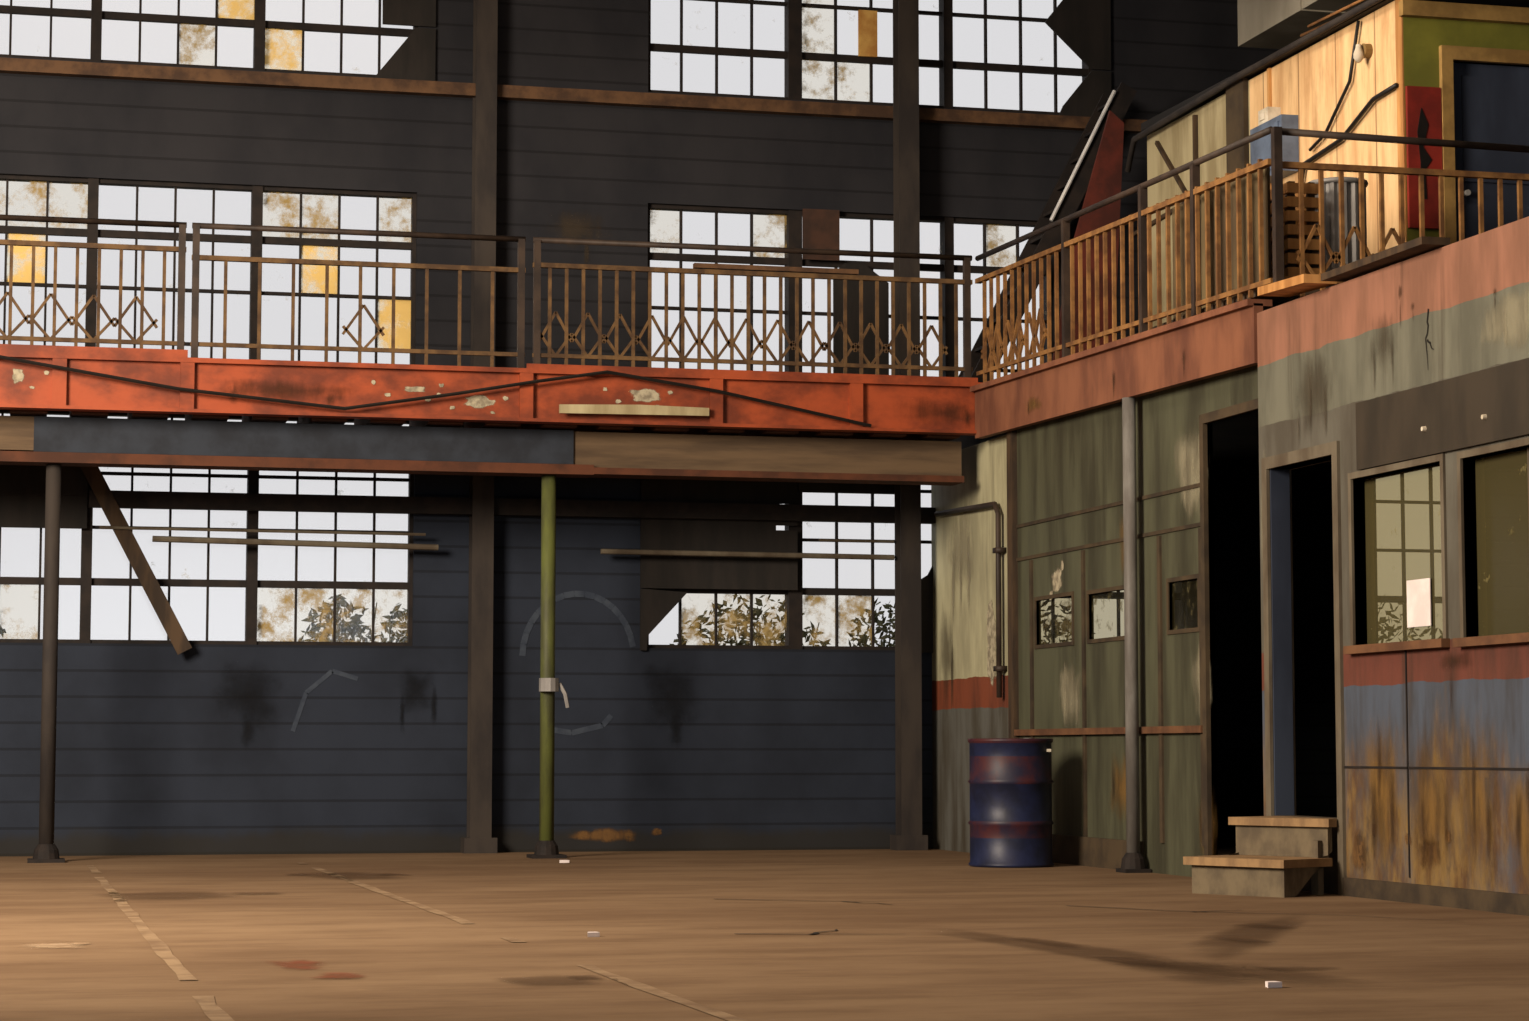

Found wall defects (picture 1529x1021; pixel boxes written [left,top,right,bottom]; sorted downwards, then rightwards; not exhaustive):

peeling [371,380,508,414]